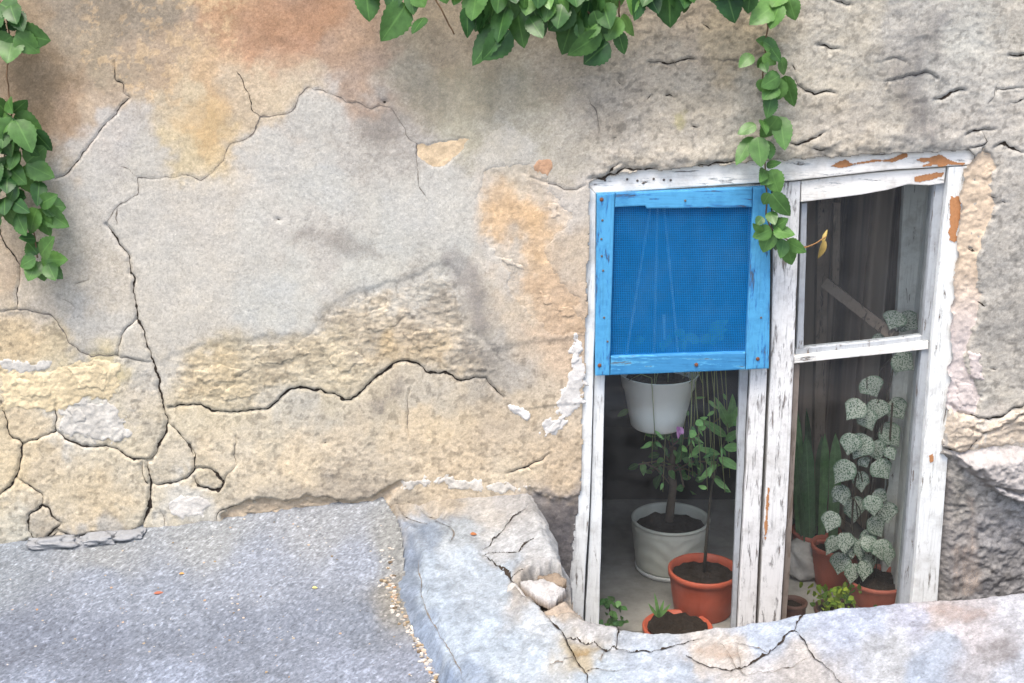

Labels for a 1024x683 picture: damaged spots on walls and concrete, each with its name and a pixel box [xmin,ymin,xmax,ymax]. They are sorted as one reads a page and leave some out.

crack [886,57,963,100]
spalling [417,138,469,167]
crack [791,132,824,151]
crack [966,129,1020,152]
crack [0,63,501,541]
spalling [176,272,487,407]
spalling [476,159,589,437]
spalling [833,148,1024,453]
spalling [0,359,132,444]
spalling [220,481,404,519]
crack [483,508,534,583]
crack [546,615,842,683]